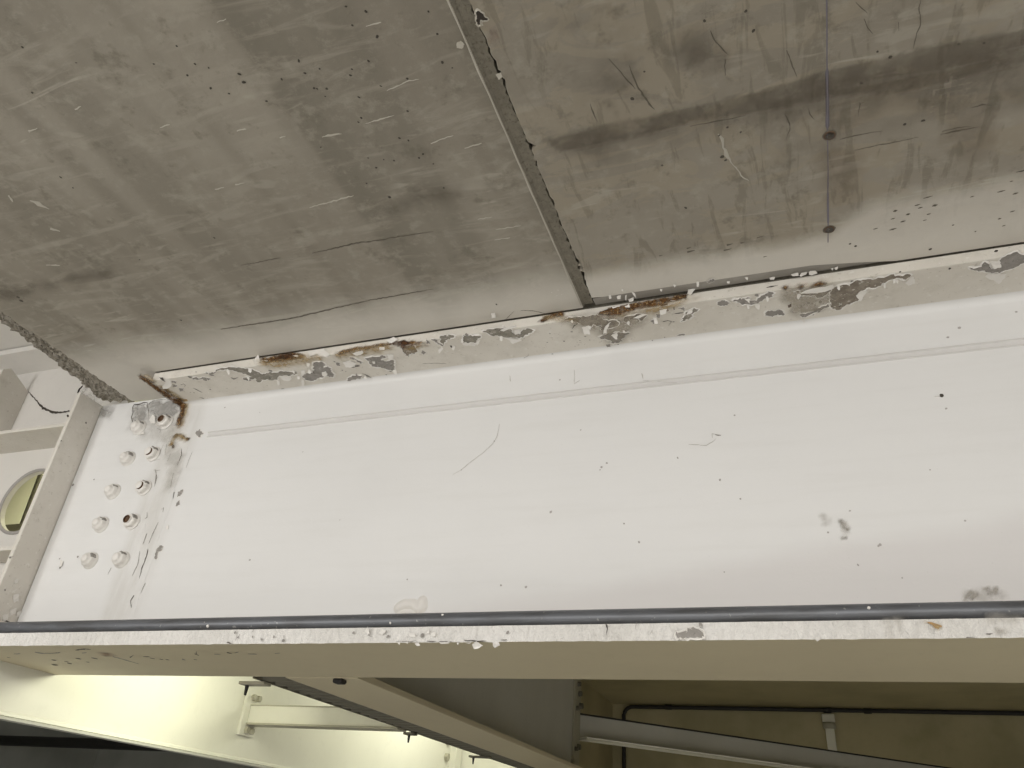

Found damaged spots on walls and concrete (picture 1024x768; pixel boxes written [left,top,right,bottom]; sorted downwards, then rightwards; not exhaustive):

peeling [967,250,1024,284]
corrosion [254,337,423,367]
peeling [421,304,536,355]
corrosion [598,295,687,316]
peeling [563,278,730,347]
peeling [716,271,915,323]
corrosion [139,374,190,448]